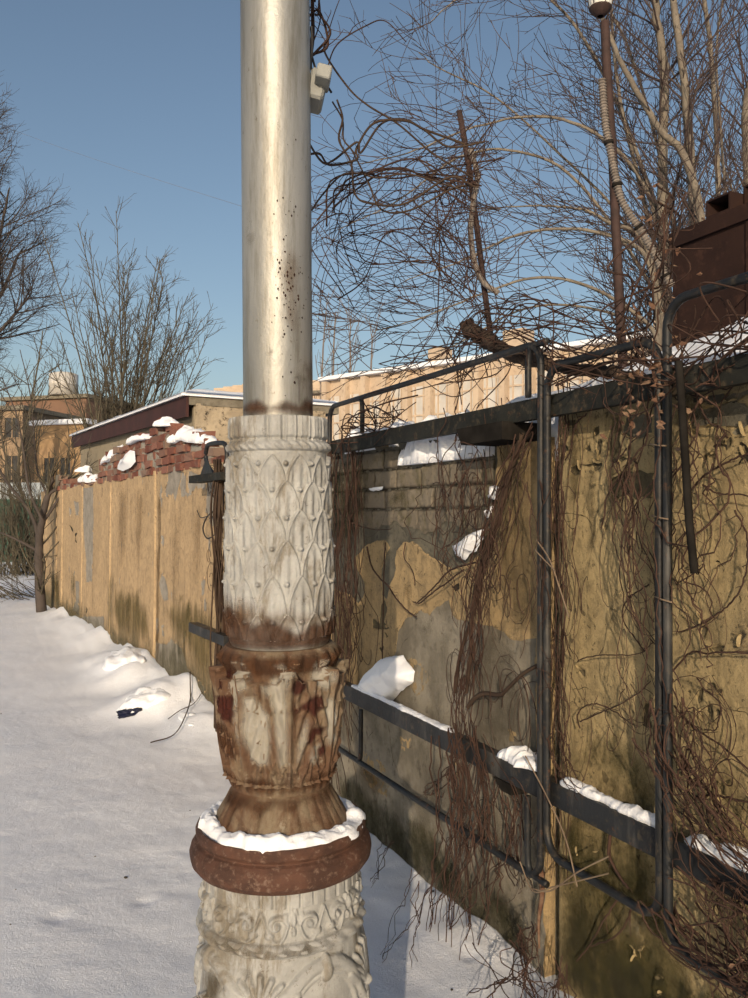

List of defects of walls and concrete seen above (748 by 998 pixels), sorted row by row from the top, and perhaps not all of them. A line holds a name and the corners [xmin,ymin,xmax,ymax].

rust [216,605,342,758]
rust [223,768,335,813]
spalling [332,441,537,752]
spalling [330,700,546,979]